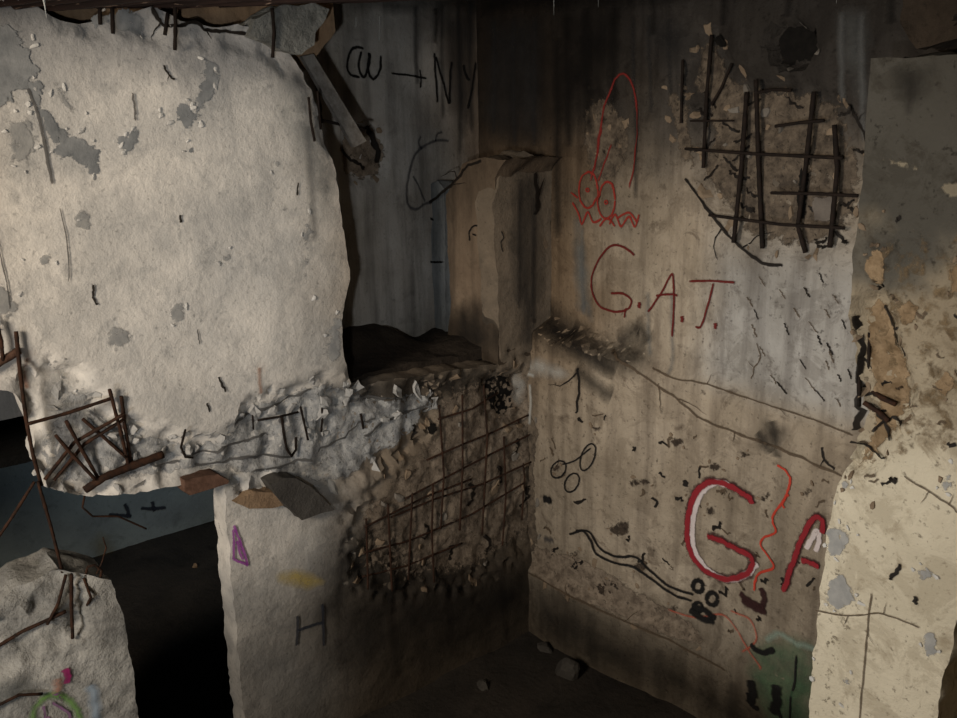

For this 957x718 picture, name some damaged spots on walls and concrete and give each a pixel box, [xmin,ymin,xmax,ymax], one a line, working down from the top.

spalling [661,22,866,261]
flaking render [943,183,957,197]
spalling [793,243,957,508]
spalling [0,287,703,651]
spalling [675,459,726,509]
spalling [699,503,731,535]
flaking render [806,519,866,647]